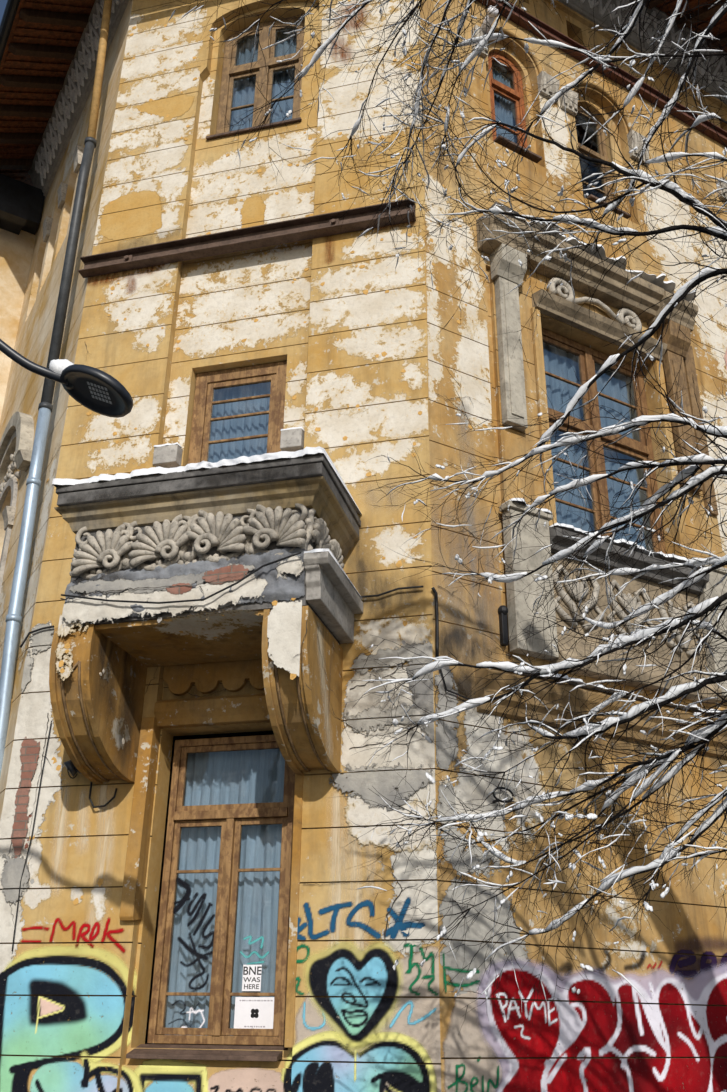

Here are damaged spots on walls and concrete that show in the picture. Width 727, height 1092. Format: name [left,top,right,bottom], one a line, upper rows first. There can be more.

peeling [93,0,422,247]
peeling [76,170,493,489]
flaking render [0,444,306,985]
flaking render [328,611,547,996]